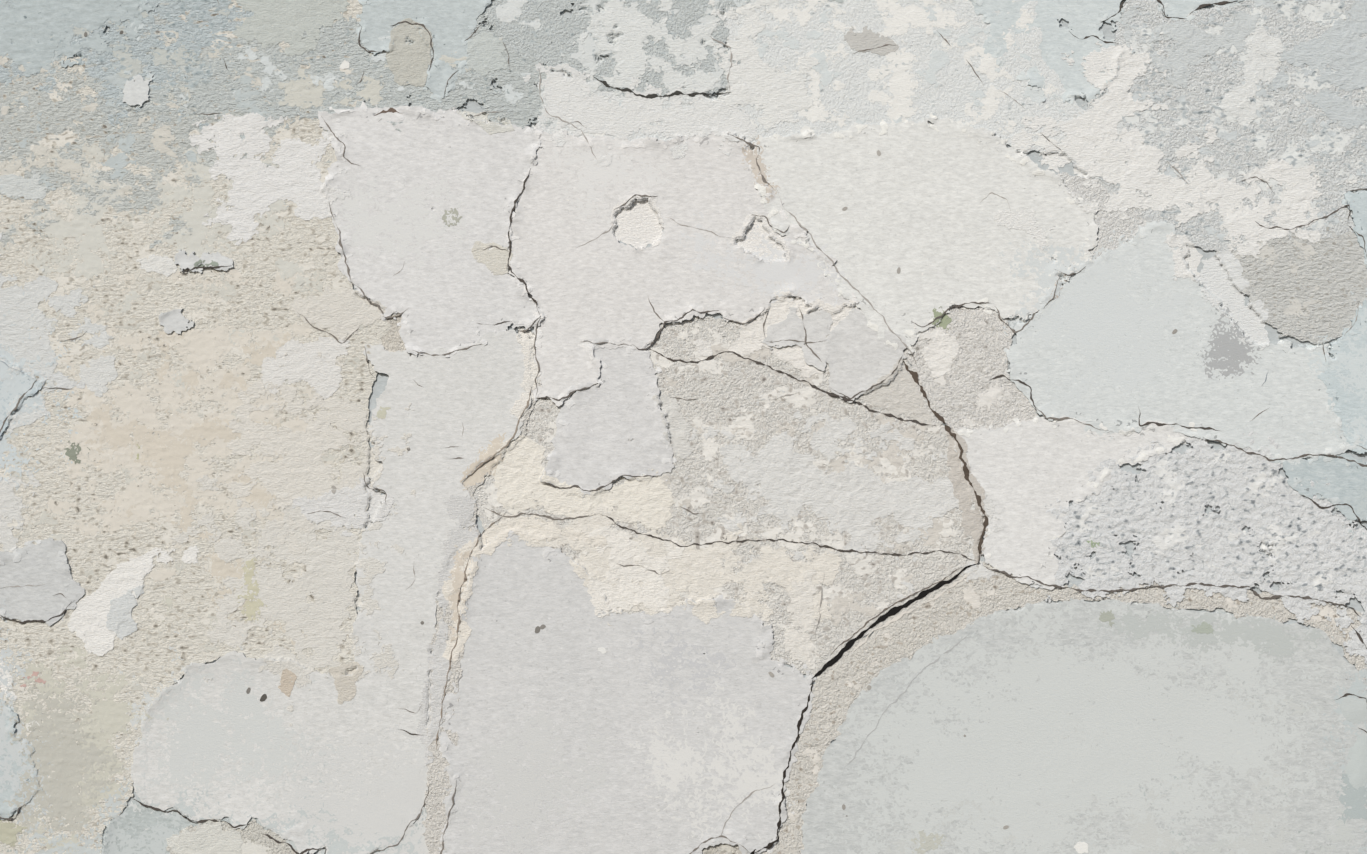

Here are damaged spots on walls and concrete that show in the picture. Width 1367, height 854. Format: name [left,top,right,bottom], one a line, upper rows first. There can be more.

crack [329,203,406,319]
peeling [510,282,547,358]
peeling [1039,253,1092,306]
peeling [520,366,603,477]
crack [990,375,1100,430]
crack [1138,407,1220,431]
peeling [462,443,584,589]
peeling [544,473,654,497]
crack [398,134,988,854]
spalling [610,297,1367,854]
peeling [370,592,467,854]
peeling [166,819,298,854]